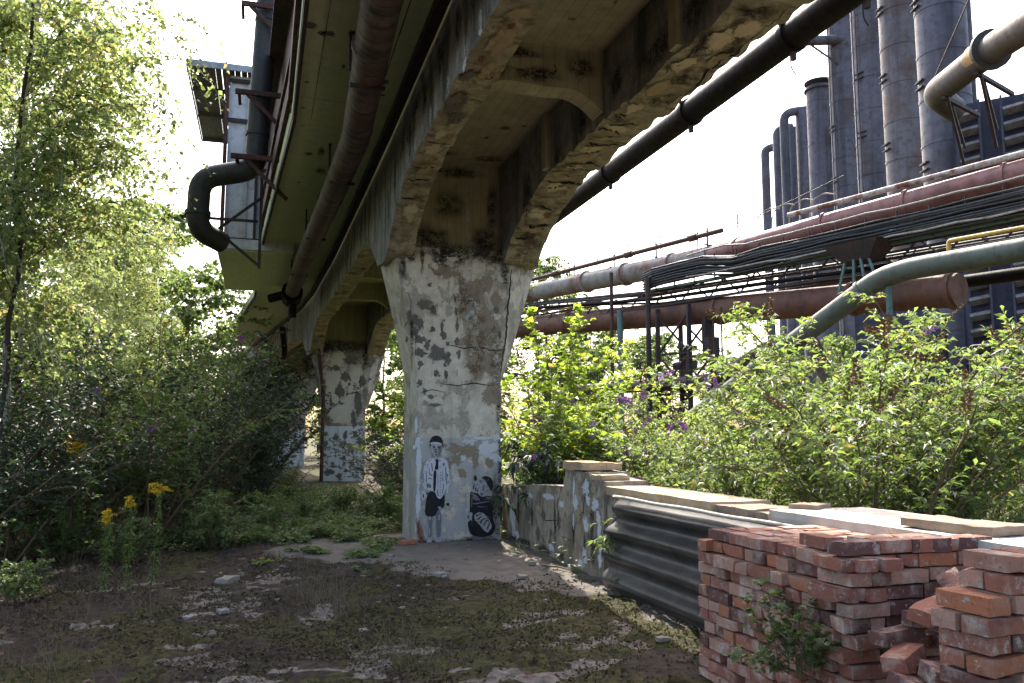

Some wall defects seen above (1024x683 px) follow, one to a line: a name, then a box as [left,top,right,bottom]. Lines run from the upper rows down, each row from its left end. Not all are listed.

spalling [518,17,764,233]
peeling [405,263,503,407]
damp [400,193,509,384]
crack [421,270,512,393]
peeling [316,356,366,481]